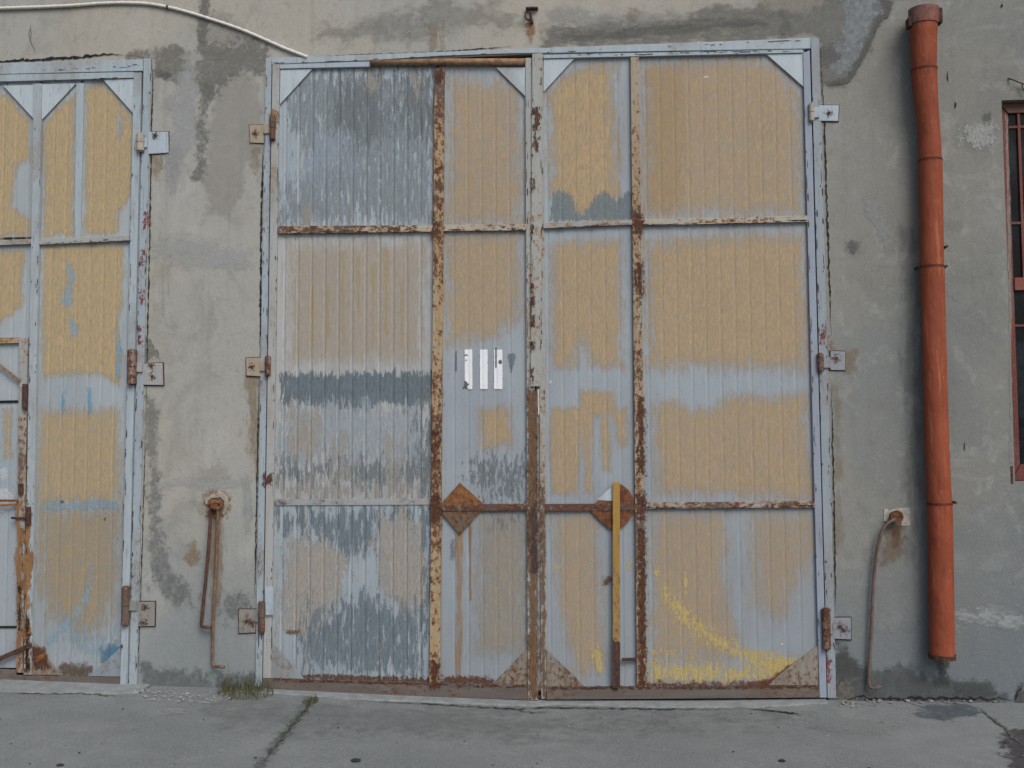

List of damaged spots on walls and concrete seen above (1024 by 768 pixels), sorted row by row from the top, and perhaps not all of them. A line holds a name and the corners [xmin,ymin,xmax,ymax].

water stain [126,0,269,181]
peeling [262,55,446,240]
rust [531,106,542,156]
rust [630,210,646,237]
rust [14,496,51,674]
water stain [146,473,187,604]
crack [265,704,310,761]
peeling [241,360,444,679]
peeling [458,437,530,514]
rust [272,367,819,700]
peeling [647,566,806,686]
water stain [835,642,1024,720]